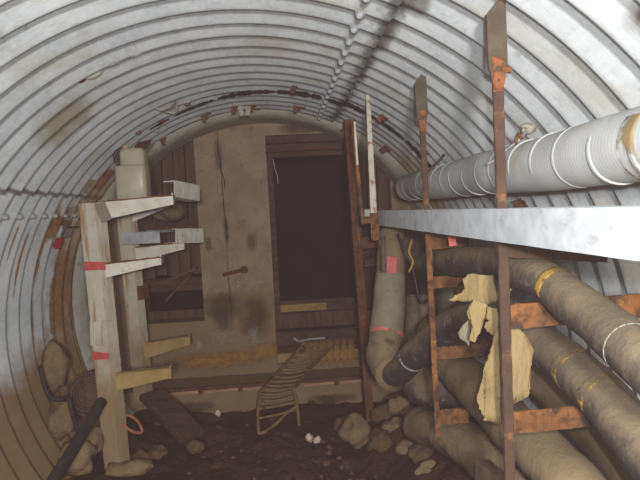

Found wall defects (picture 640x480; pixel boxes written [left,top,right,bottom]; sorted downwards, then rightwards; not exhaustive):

crack [217,139,228,241]
rust [14,234,28,285]
rust [34,208,60,276]
rust [49,253,74,339]